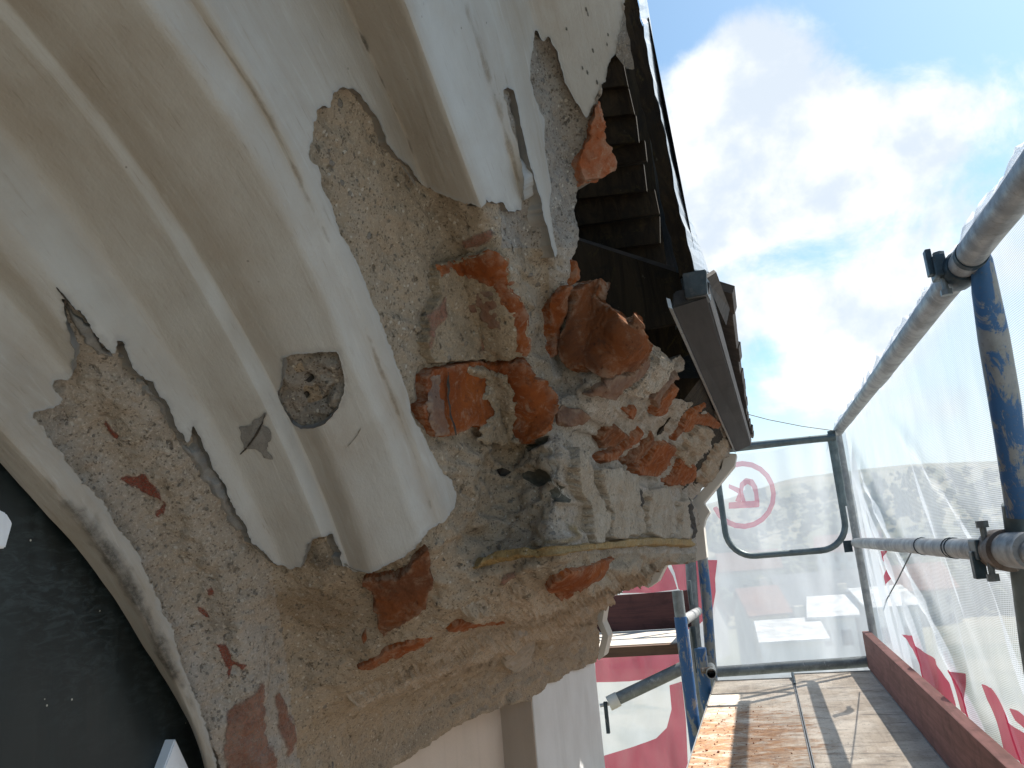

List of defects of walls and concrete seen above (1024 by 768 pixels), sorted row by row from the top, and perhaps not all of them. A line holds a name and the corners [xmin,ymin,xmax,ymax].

flaking render [33,33,732,768]